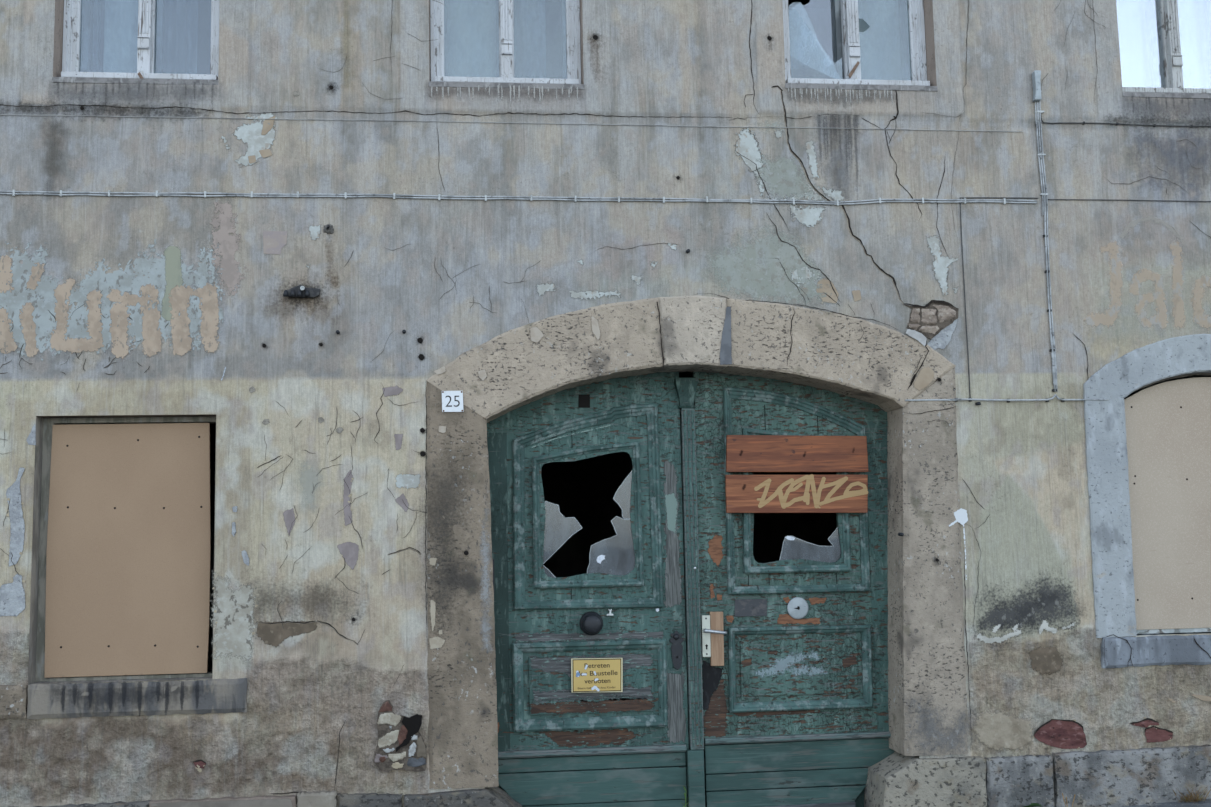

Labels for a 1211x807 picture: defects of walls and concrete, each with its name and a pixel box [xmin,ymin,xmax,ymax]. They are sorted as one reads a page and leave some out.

peeling [221,112,277,167]
crack [0,0,685,190]
peeling [734,122,844,227]
crack [693,0,969,424]
peeling [709,228,861,304]
spalling [904,235,959,340]
spalling [0,467,26,617]
peeling [283,508,295,536]
peeling [341,470,354,527]
peeling [337,542,359,570]
peeling [210,572,317,661]
spalling [374,700,427,772]